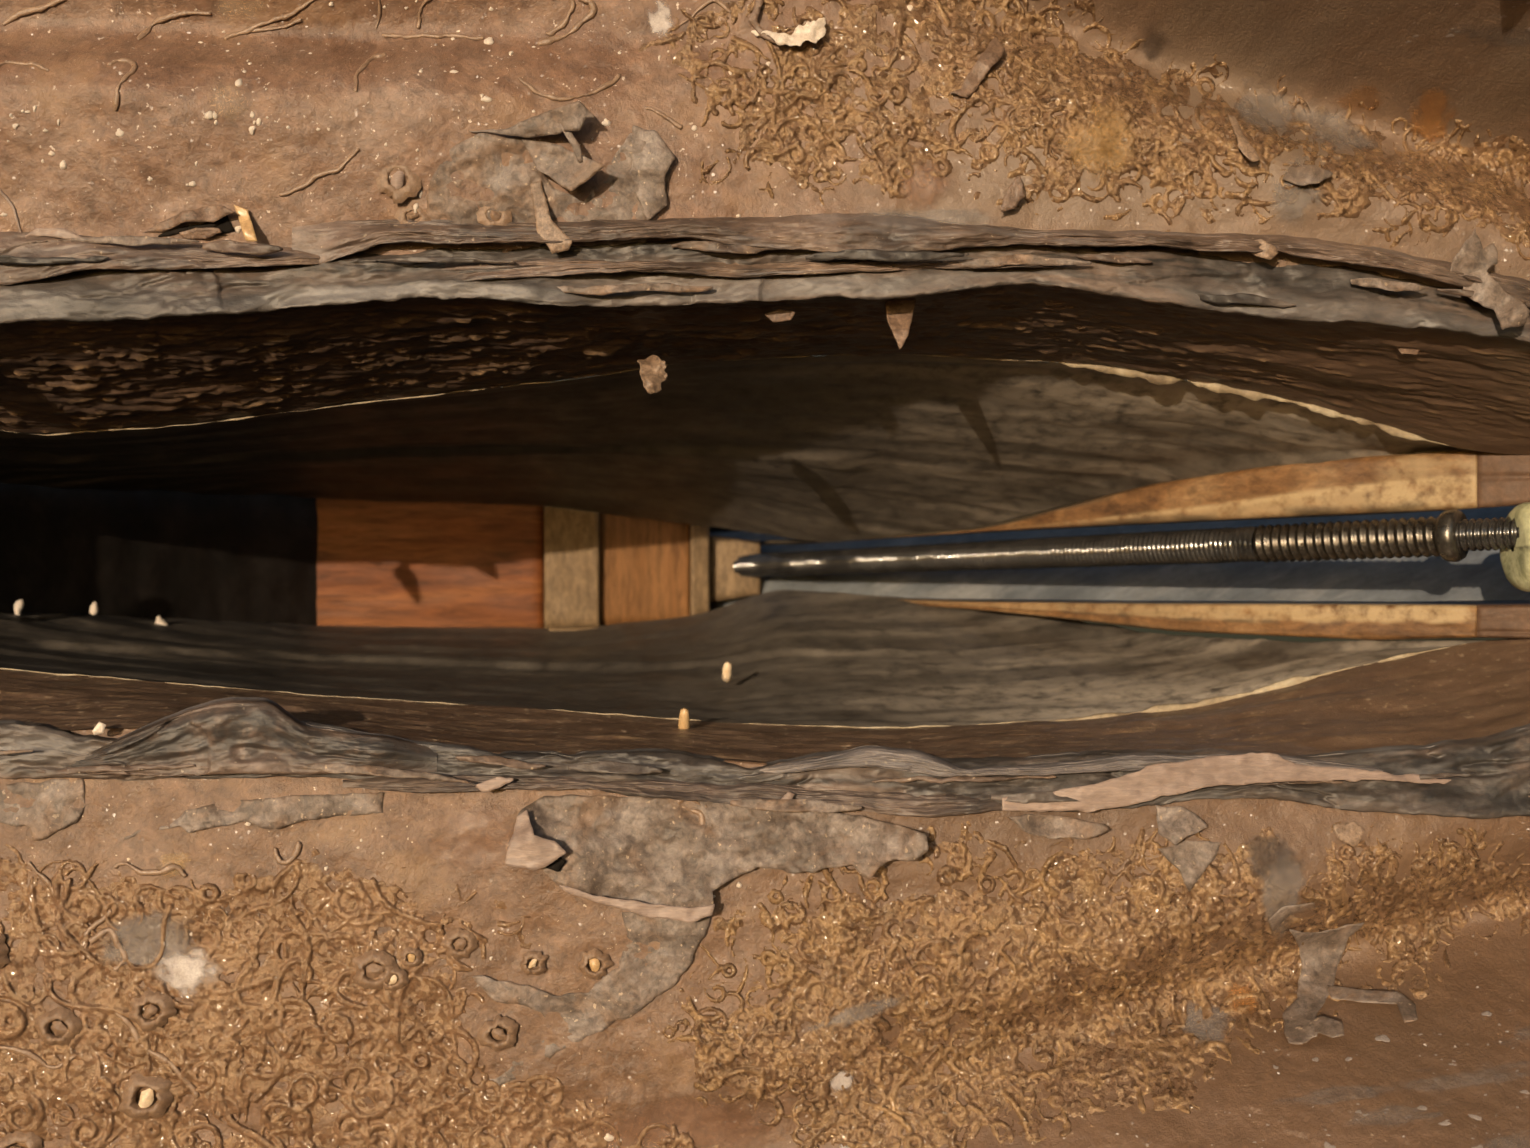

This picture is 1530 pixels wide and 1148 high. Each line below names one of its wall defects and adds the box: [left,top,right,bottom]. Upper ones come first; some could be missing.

peeling [426,101,675,254]
peeling [472,791,929,1058]
peeling [1269,903,1418,1044]